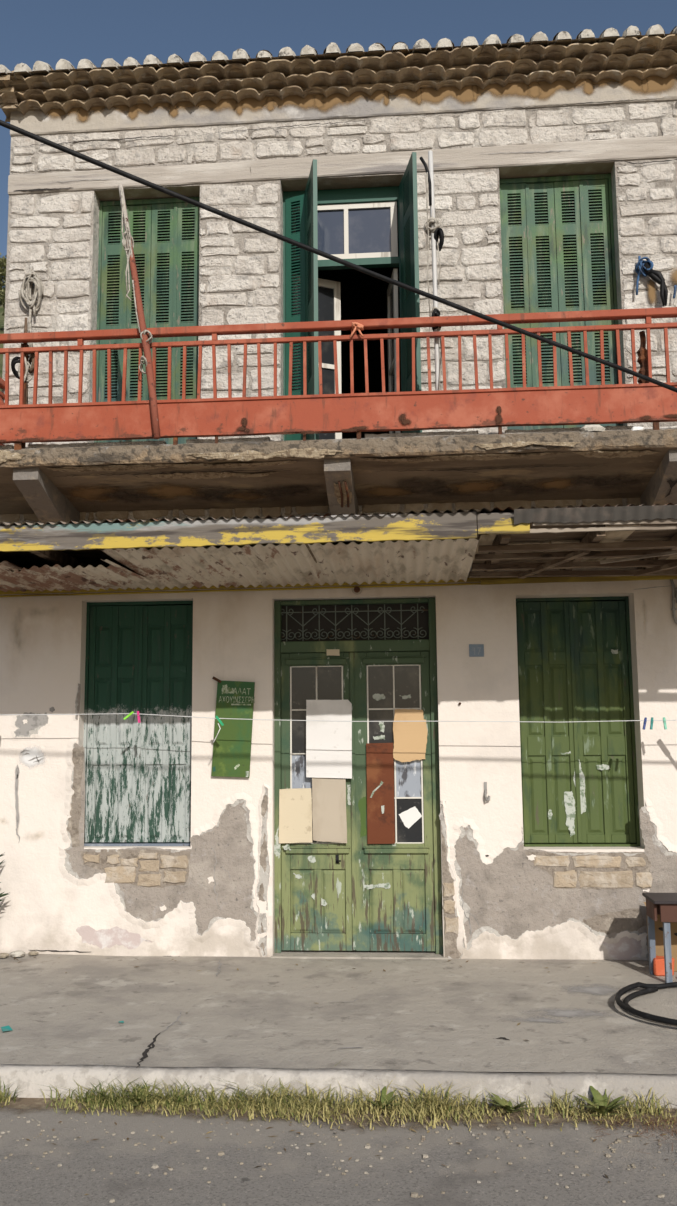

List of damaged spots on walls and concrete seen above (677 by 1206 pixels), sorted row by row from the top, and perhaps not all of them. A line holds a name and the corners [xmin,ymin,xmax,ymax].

peeling [11,705,56,741]
peeling [58,736,273,957]
peeling [439,798,677,960]
peeling [548,751,610,837]